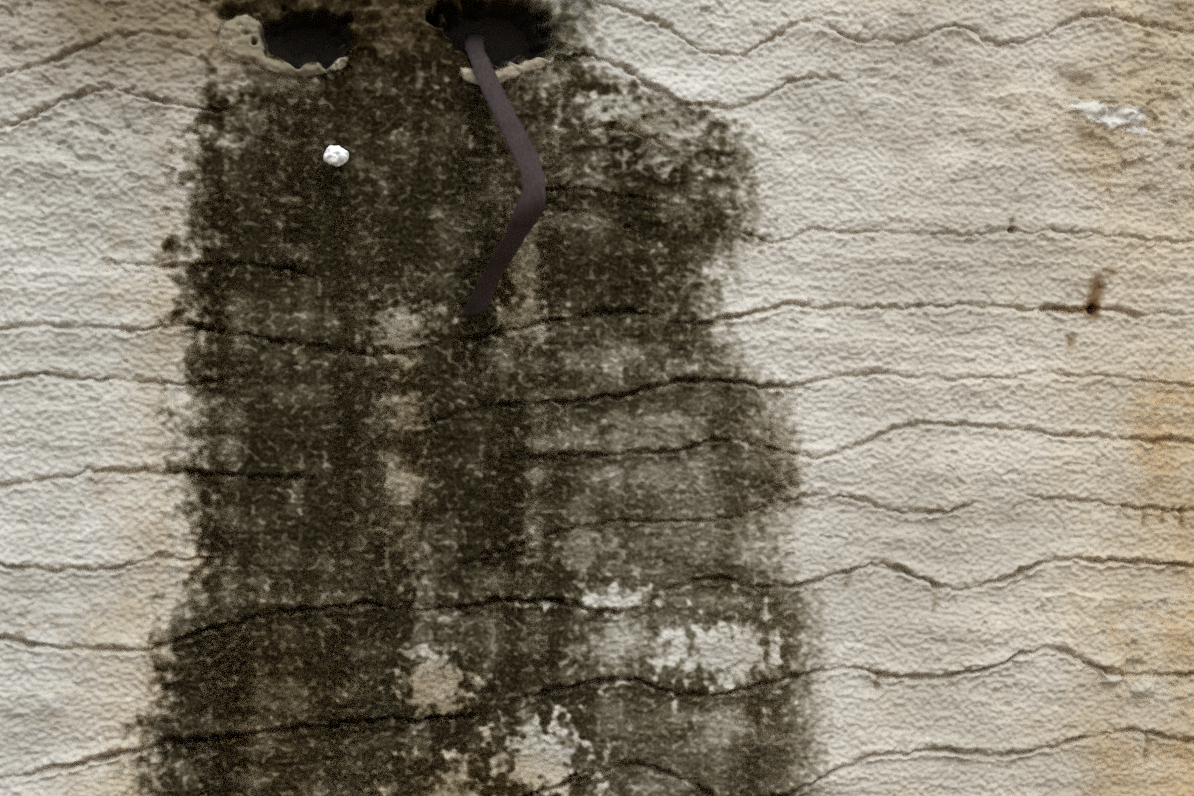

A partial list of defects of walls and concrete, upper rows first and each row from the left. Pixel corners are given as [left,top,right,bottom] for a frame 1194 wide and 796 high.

spalling [219,15,352,77]
spalling [426,4,549,84]
rust [1086,282,1099,316]
damp [125,0,813,796]